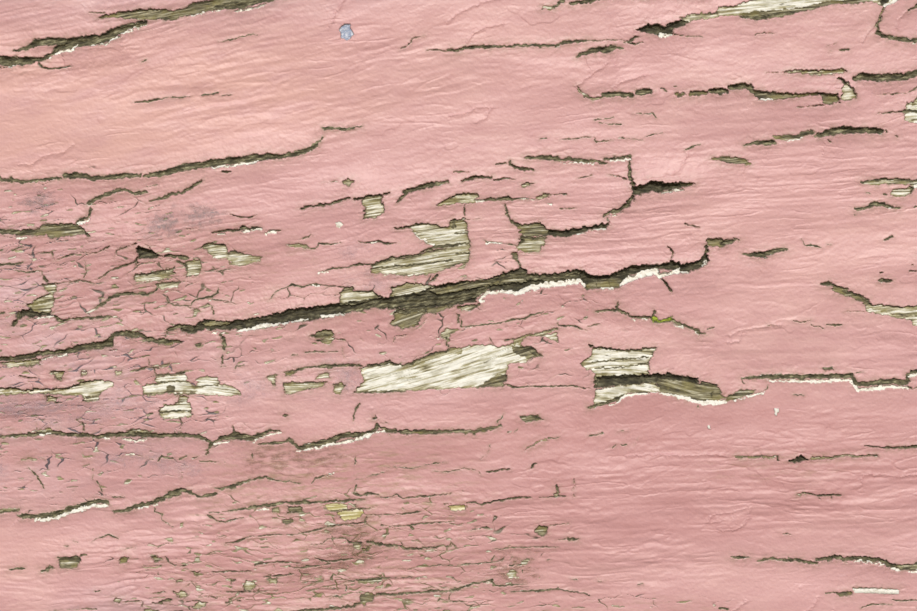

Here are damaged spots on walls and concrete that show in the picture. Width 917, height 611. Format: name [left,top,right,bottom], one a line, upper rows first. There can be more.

crack [0,0,275,71]
crack [400,35,644,53]
peeling [635,0,899,38]
crack [395,69,917,223]
peeling [876,97,917,124]
crack [0,136,324,280]
peeling [317,182,612,283]
crack [0,222,715,382]
peeling [819,280,917,327]
peeling [141,369,242,420]
peeling [266,326,728,410]
crack [0,403,591,611]